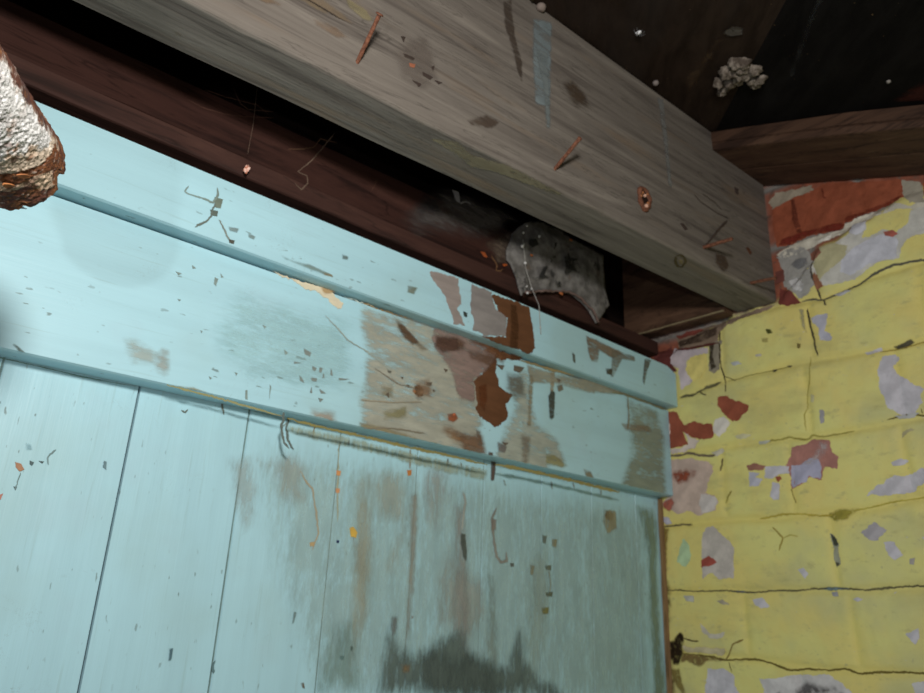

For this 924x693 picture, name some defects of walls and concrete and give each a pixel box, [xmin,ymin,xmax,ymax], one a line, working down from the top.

leakage [325,315,435,417]
leakage [436,338,459,351]
peeling [430,271,507,401]
spalling [587,179,924,390]
crack [612,259,924,471]
leakage [280,349,623,518]
peeling [663,396,749,525]
peeling [747,439,839,500]
leakage [383,492,558,693]
crack [773,527,798,551]
crack [668,533,924,593]
crack [683,639,924,675]